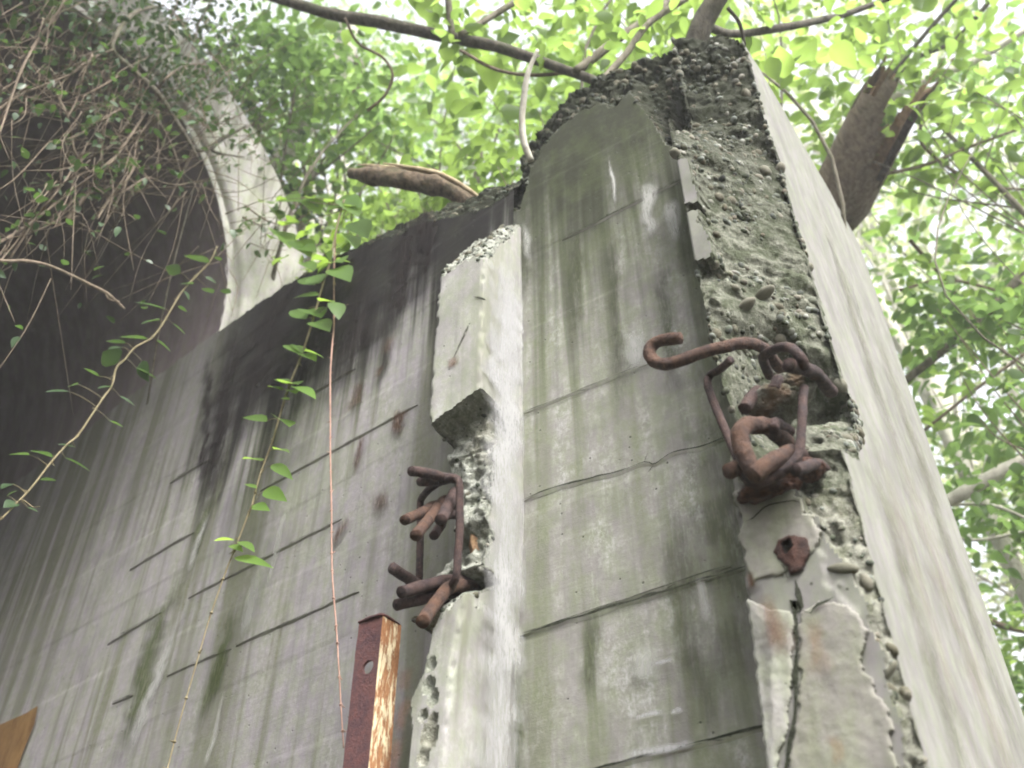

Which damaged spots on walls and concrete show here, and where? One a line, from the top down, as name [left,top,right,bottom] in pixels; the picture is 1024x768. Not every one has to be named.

efflorescence [643,188,654,229]
damp [197,210,437,497]
spalling [332,33,929,768]
corrosion [773,535,810,575]
crack [781,564,833,768]